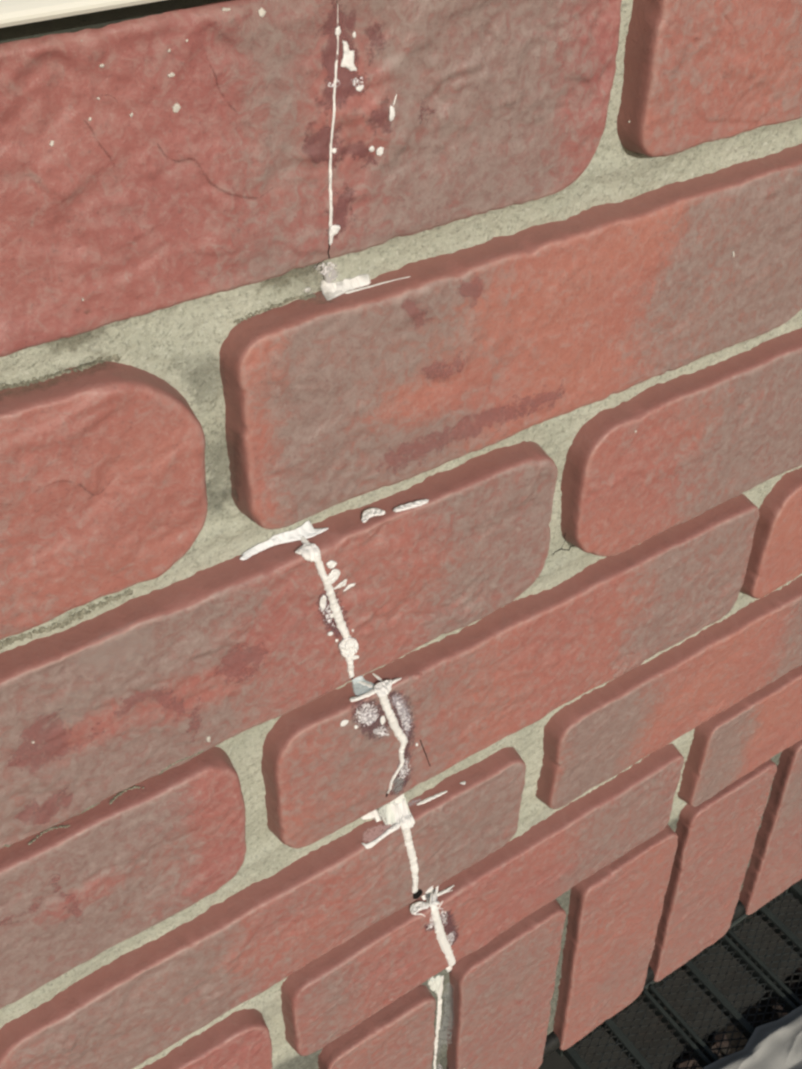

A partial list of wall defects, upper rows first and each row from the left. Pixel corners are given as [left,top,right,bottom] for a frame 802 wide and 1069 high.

crack [413,889,423,899]